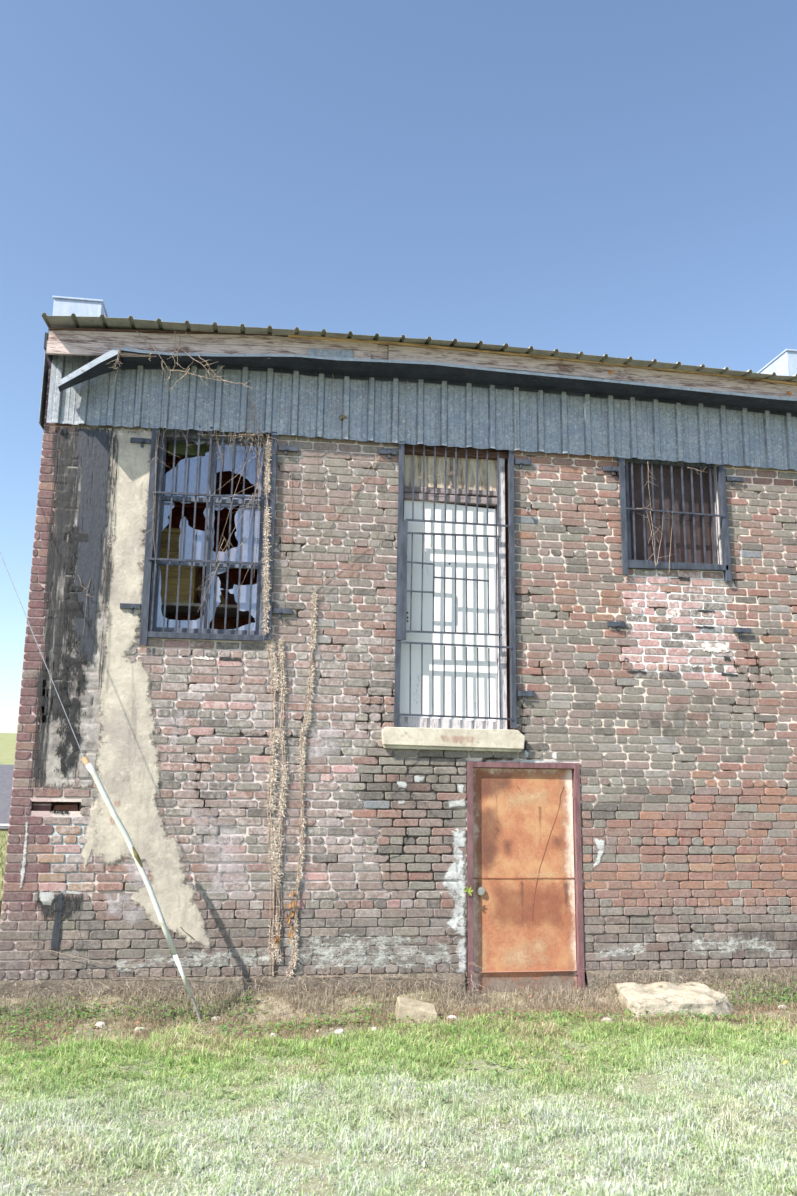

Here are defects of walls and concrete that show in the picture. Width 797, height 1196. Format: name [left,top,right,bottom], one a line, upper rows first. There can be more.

peeling [37,427,211,949]
corrosion [473,768,576,993]
leakage [289,934,451,970]
leakage [596,942,646,958]
leakage [690,937,775,956]